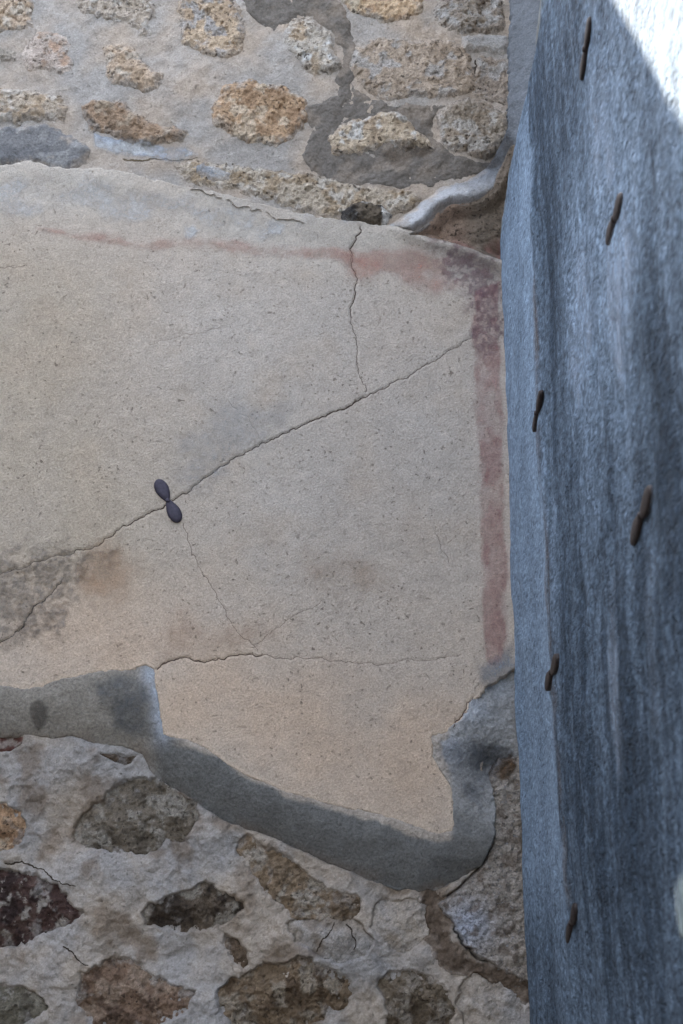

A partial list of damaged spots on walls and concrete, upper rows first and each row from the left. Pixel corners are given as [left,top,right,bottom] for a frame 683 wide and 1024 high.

flaking render [0,0,511,226]
crack [0,227,468,670]
water stain [32,701,46,729]
flaking render [0,735,530,1024]